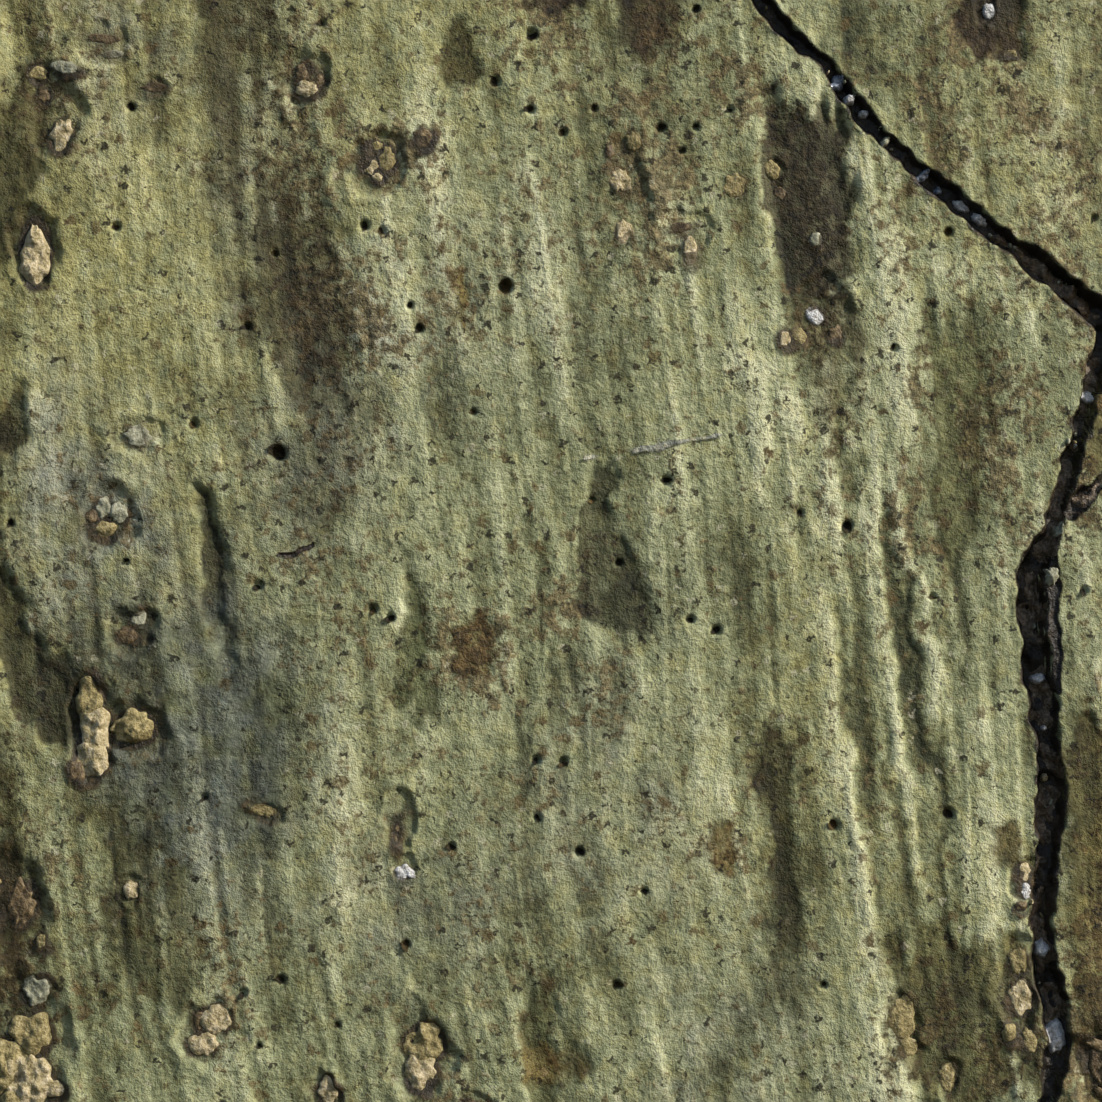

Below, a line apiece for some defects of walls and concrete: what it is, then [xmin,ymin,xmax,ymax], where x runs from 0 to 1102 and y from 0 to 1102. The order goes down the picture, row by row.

crack [752,0,1102,1102]